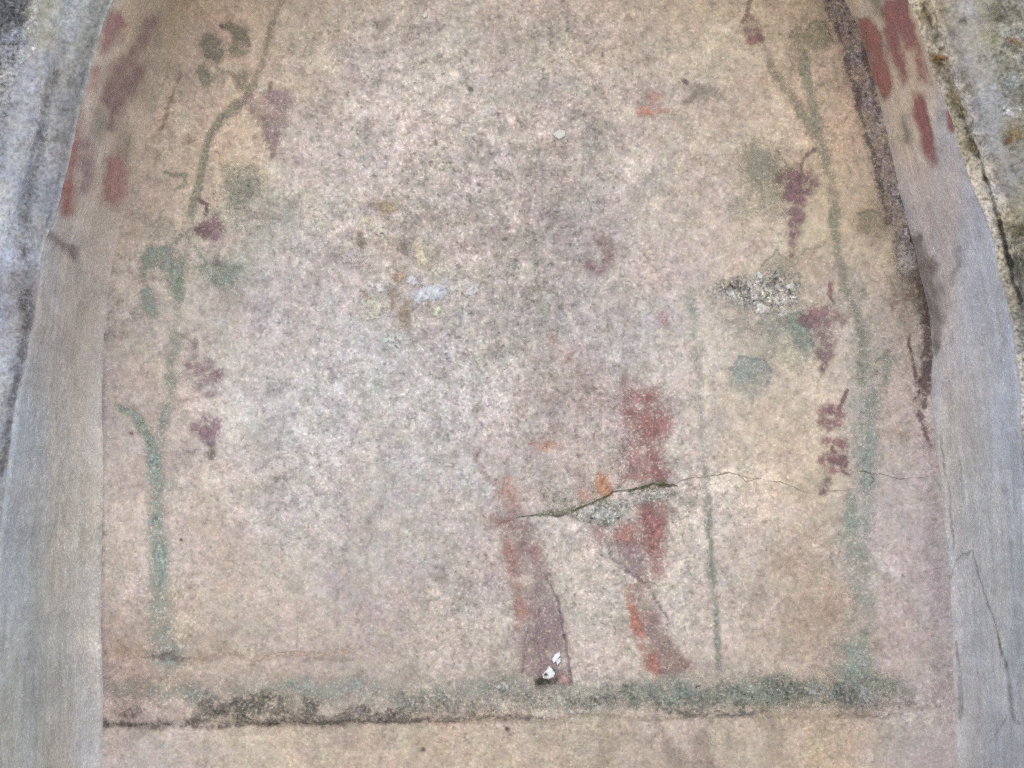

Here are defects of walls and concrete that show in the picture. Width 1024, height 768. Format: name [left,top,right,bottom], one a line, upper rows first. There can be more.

spalling [712,271,801,316]
crack [522,472,798,517]